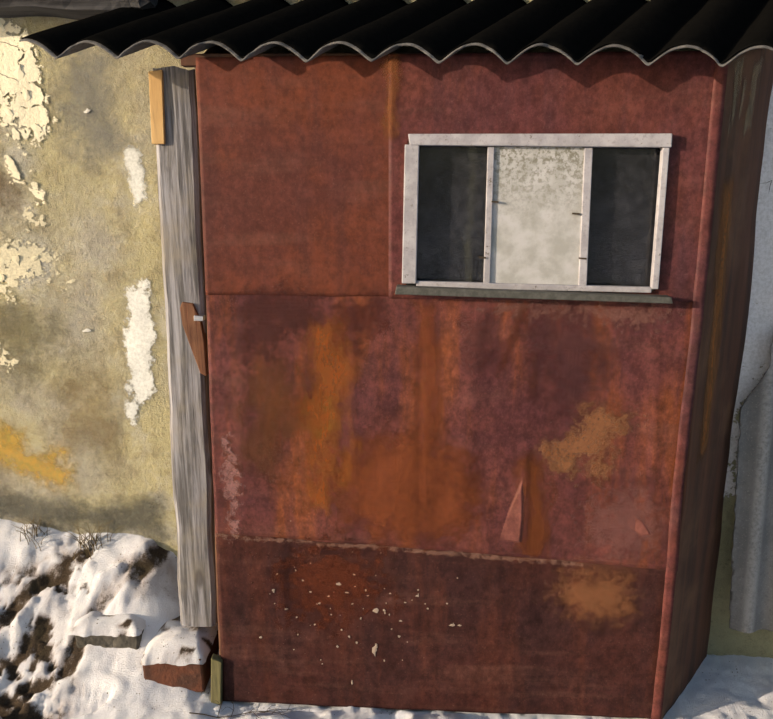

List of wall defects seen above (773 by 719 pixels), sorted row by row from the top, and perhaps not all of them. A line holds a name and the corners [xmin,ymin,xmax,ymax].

flaking render [0,18,58,156]
flaking render [0,343,20,373]
flaking render [0,155,76,305]
peeling [124,396,139,427]
rust [701,181,732,454]
peeling [724,87,773,498]
rust [268,535,401,631]